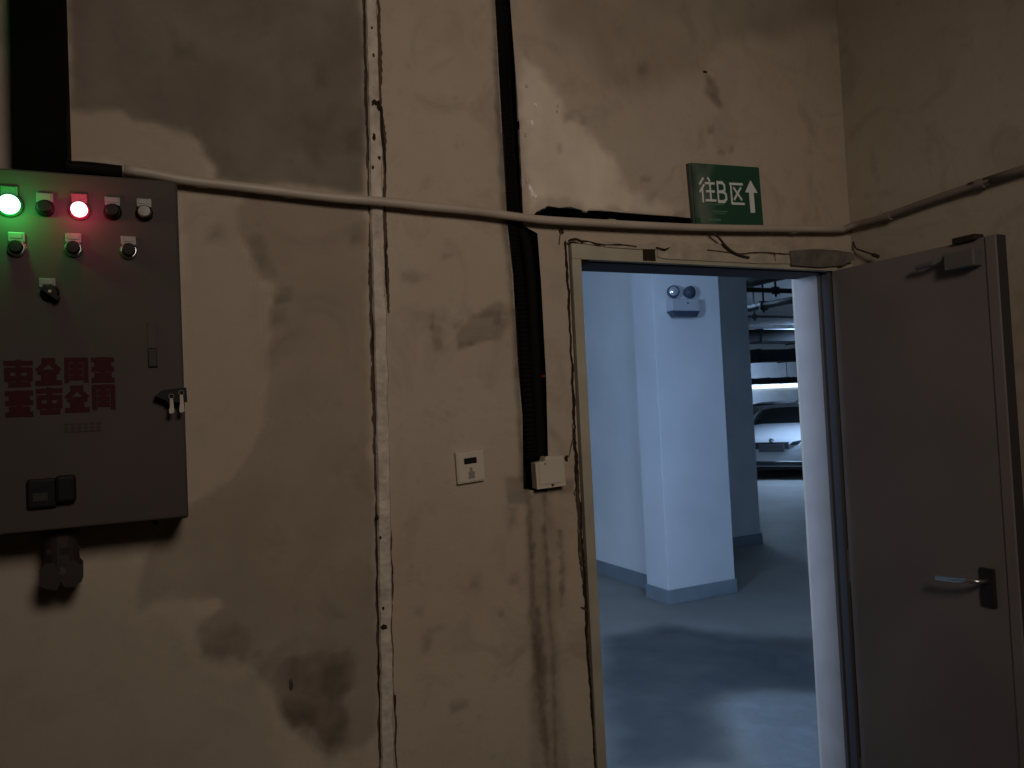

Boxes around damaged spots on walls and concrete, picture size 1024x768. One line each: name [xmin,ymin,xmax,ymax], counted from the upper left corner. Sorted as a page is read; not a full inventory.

crack [362,0,398,768]